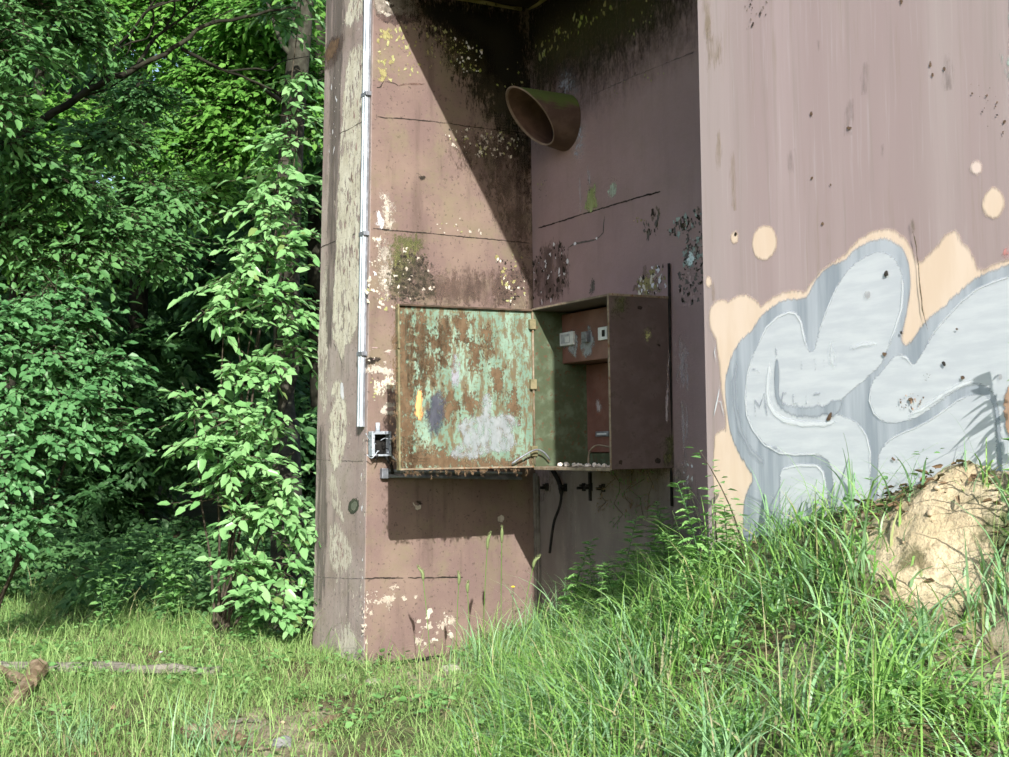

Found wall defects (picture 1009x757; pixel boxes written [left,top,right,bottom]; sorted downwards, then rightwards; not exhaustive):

spalling [344,0,455,82]
damp [402,0,689,256]
damp [425,268,533,308]
peeling [532,242,568,305]
peeling [633,208,703,307]
peeling [318,46,418,661]
rust [384,302,533,479]
peeling [415,608,458,646]